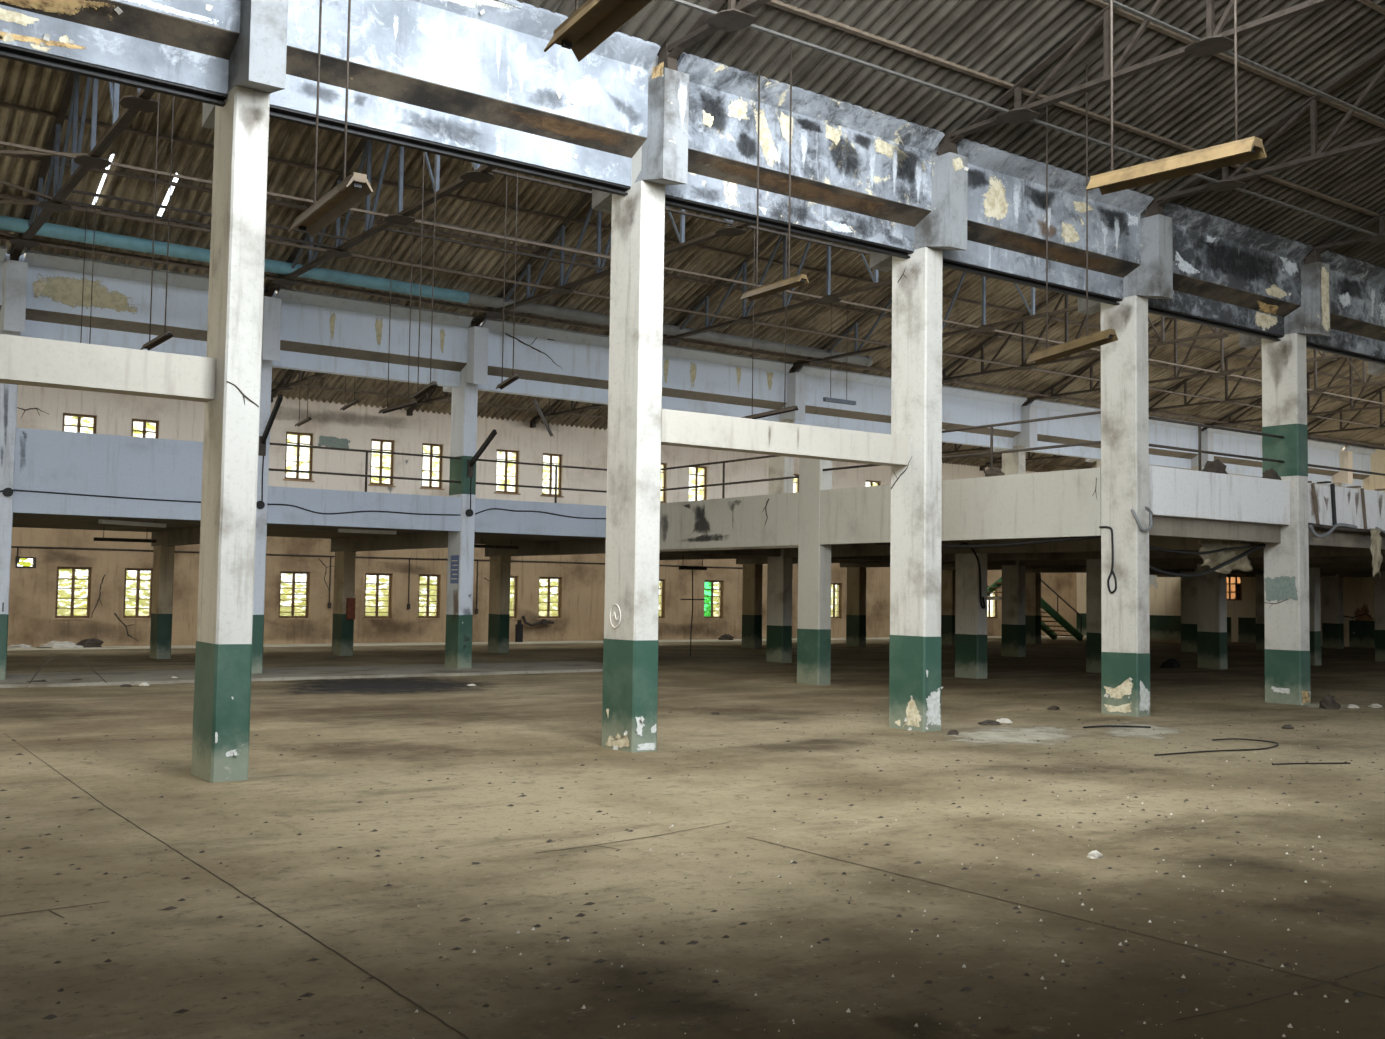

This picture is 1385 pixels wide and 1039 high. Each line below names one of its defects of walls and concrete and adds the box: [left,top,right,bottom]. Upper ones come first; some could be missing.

spalling [0,0,123,52]
damp [679,87,727,131]
damp [737,134,757,158]
peeling [702,96,794,164]
damp [798,119,875,182]
damp [892,148,922,193]
damp [825,220,866,233]
spalling [1255,284,1291,331]
damp [685,504,722,542]
peeling [895,670,943,730]
peeling [1104,678,1150,715]
peeling [605,716,656,751]